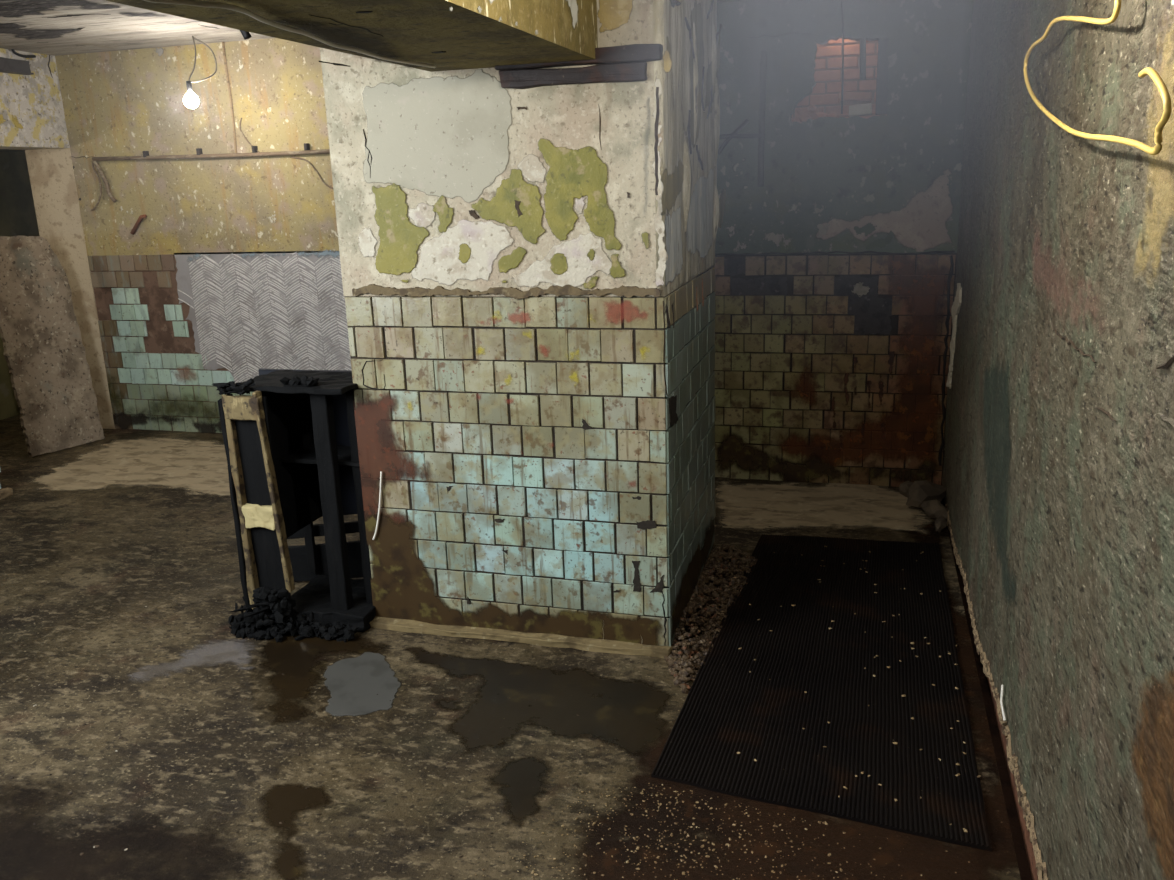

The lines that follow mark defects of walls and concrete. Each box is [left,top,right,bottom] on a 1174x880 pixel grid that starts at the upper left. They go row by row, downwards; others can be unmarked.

peeling [567,0,578,29]
peeling [597,0,633,33]
peeling [689,0,720,148]
peeling [352,36,788,299]
peeling [816,169,953,252]
peeling [830,270,892,335]
leakage [34,437,230,496]
corrosion [354,394,429,524]
leakage [365,434,949,646]